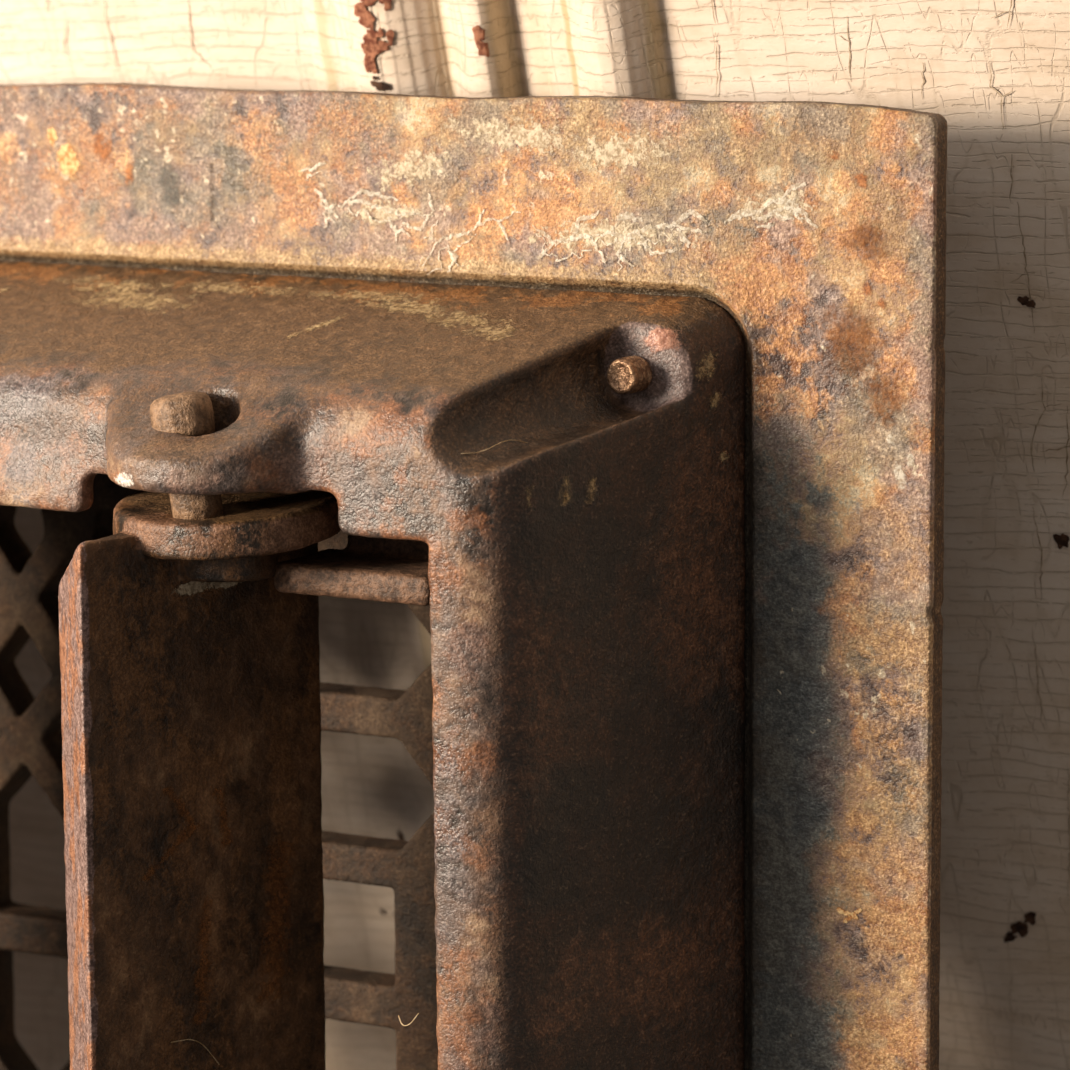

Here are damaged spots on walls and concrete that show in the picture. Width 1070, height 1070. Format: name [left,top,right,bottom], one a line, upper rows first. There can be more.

crack [188,0,211,67]
crack [711,0,719,98]
crack [839,20,851,80]
crack [988,61,1013,130]
rust [47,128,80,178]
crack [1009,158,1035,333]
crack [1031,378,1070,493]
rust [836,907,862,923]